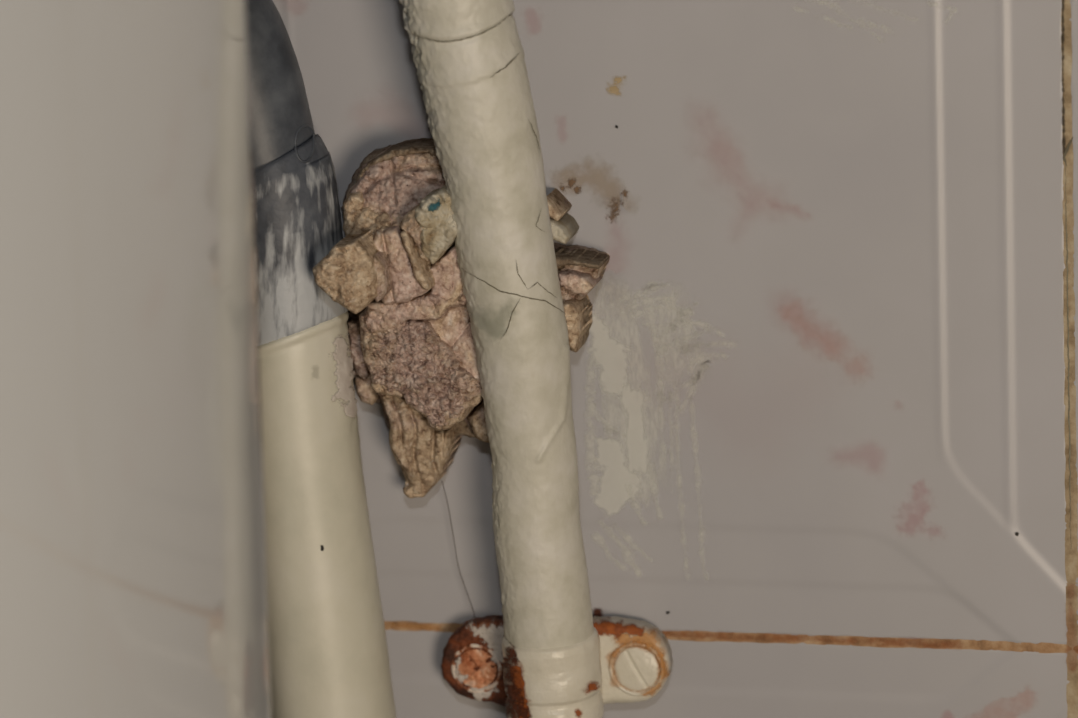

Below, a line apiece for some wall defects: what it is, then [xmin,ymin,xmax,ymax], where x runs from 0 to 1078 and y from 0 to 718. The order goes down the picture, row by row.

crack [467,263,566,337]
rust [503,646,531,718]
rust [593,608,669,696]